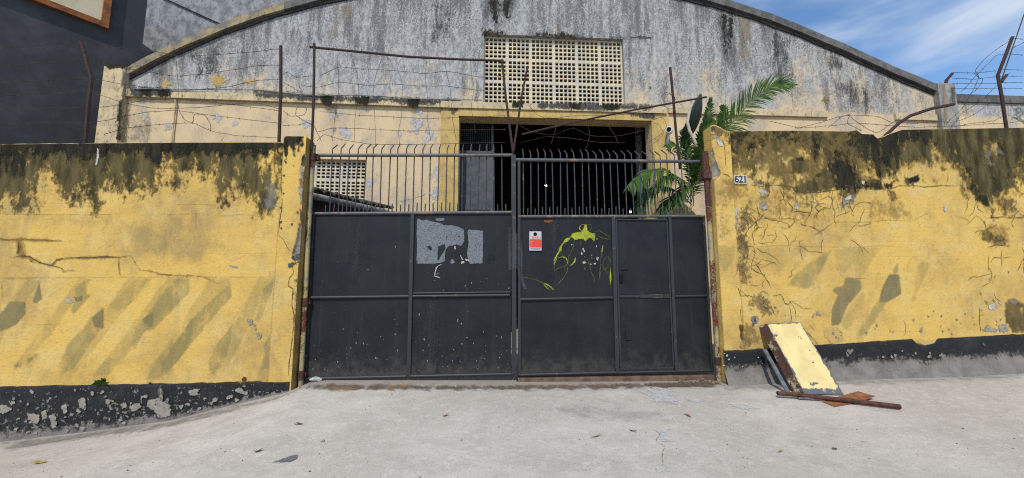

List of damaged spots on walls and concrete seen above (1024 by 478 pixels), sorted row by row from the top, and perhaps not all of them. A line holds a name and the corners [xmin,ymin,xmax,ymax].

water stain [253,88,460,114]
water stain [482,0,515,35]
water stain [526,31,593,39]
water stain [538,101,655,119]
water stain [720,14,762,67]
water stain [773,29,794,89]
water stain [830,52,867,112]
water stain [0,63,304,219]
water stain [711,84,1024,245]
crack [0,213,218,284]
crack [712,134,1024,346]
peeling [0,388,248,435]